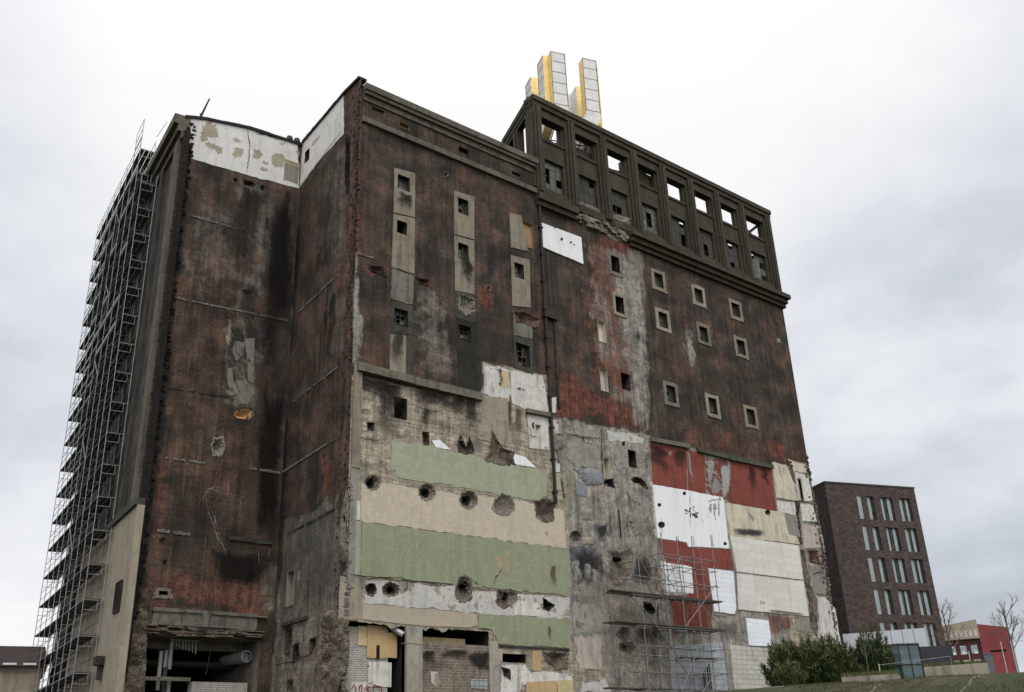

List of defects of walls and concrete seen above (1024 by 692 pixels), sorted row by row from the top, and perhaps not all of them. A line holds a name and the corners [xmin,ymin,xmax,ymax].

spalling [576,202,631,242]
leakage [225,188,298,368]
spalling [458,292,477,316]
spalling [123,121,285,692]
spalling [484,429,516,466]
spalling [492,493,515,517]
spalling [532,496,555,534]
peeling [684,459,730,520]
leakage [210,517,269,583]
spalling [454,574,473,603]